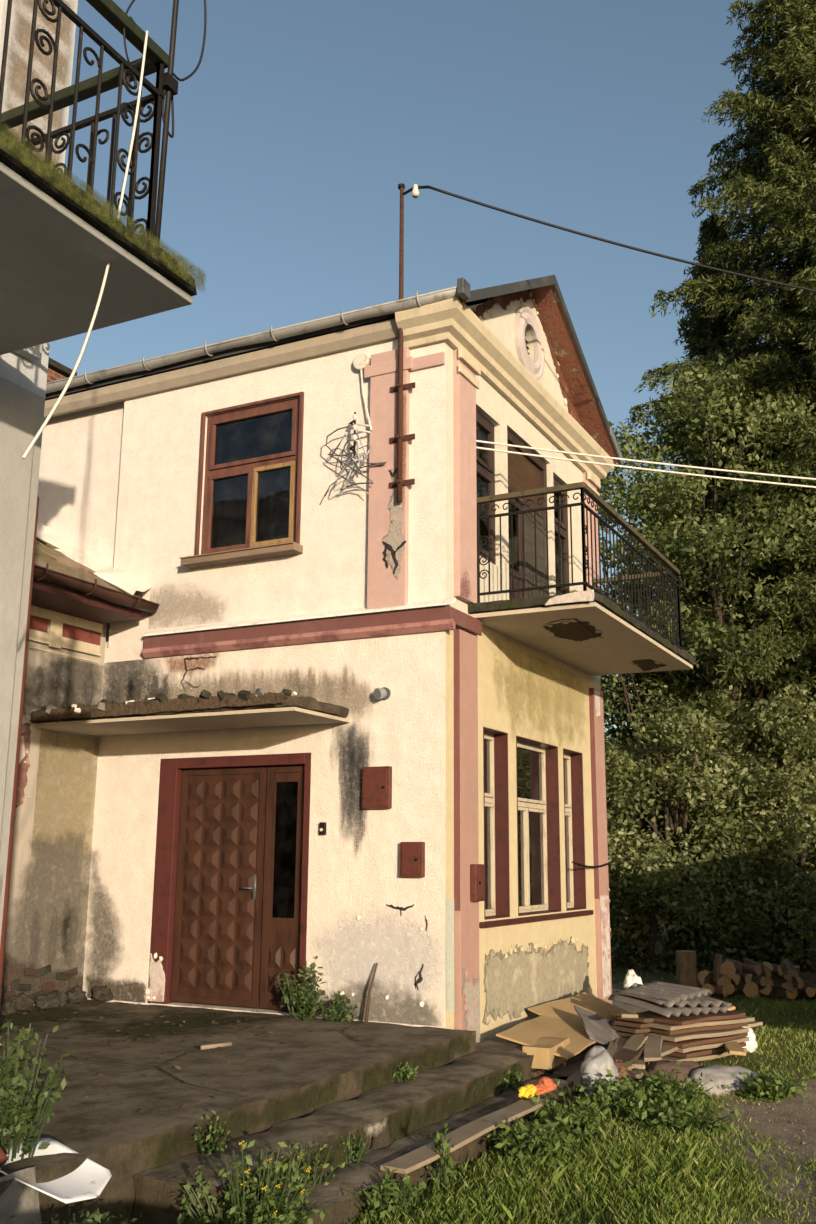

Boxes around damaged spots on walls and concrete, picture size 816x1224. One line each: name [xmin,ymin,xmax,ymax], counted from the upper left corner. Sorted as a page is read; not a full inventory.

flaking render [472,290,582,426]
flaking render [545,590,594,605]
spalling [544,619,603,643]
spalling [16,688,297,808]
damp [23,657,370,848]
damp [4,838,118,987]
flaking render [446,888,611,1043]